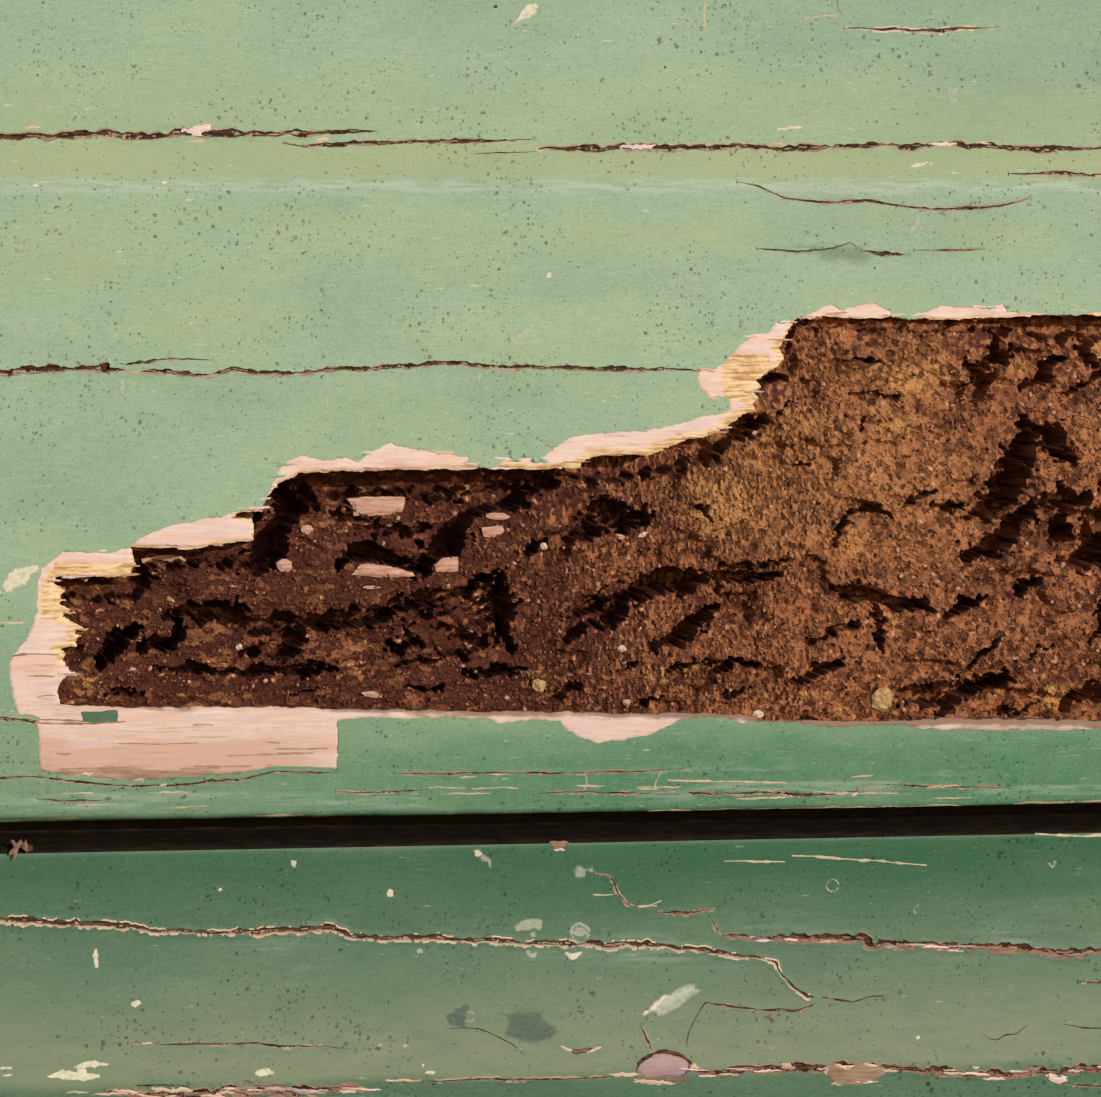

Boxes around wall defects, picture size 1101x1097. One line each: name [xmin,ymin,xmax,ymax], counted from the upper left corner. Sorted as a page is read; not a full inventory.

crack [804,0,997,39]
crack [0,123,1101,216]
crack [757,237,983,262]
crack [0,353,699,384]
peeling [10,302,1101,780]
crack [0,763,1007,815]
crack [0,870,1101,1097]
peeling [609,1049,699,1085]
peeling [824,1063,886,1086]